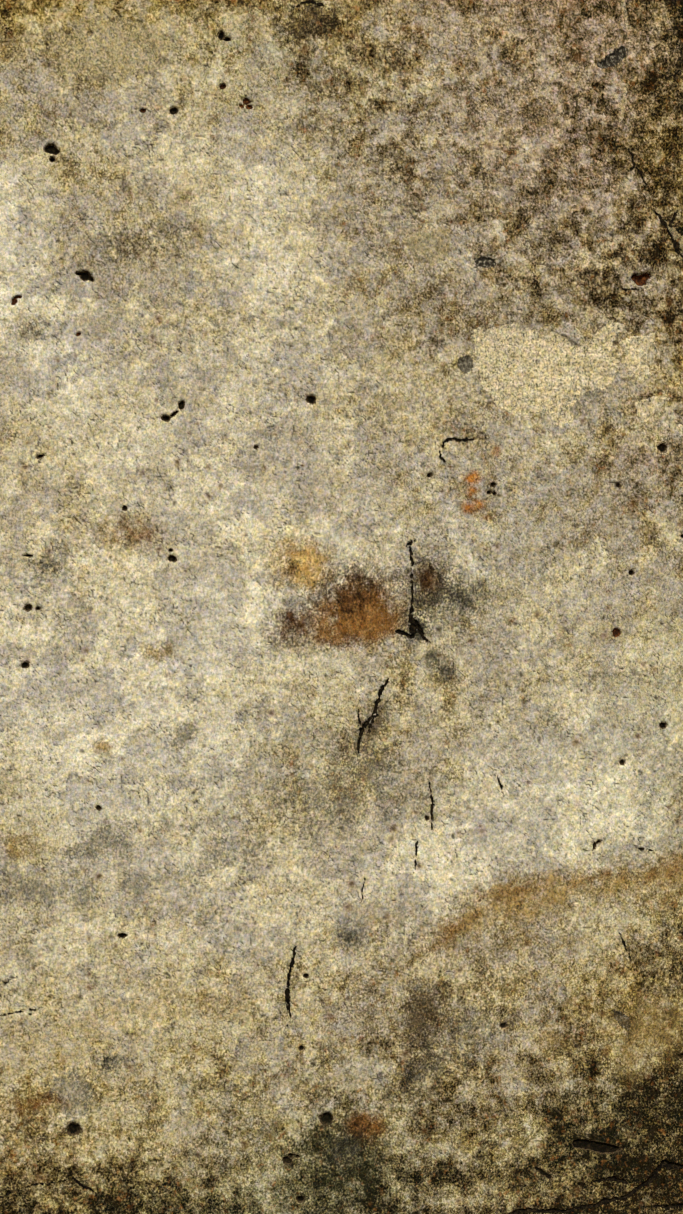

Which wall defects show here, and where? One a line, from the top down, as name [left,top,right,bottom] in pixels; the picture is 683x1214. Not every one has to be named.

rust [464,472,488,519]
rust [271,539,449,647]
crack [395,540,430,642]
crack [357,678,389,753]
rust [432,853,683,950]
crack [285,946,297,1027]
damp [50,1075,89,1119]
damp [299,1123,380,1198]
crack [509,1160,683,1214]